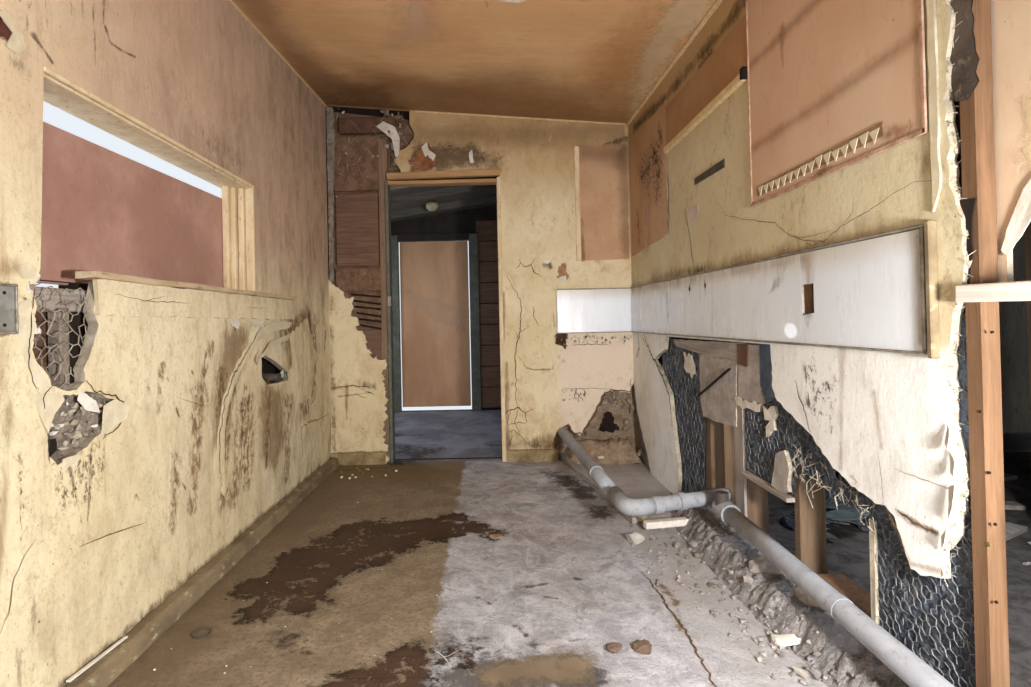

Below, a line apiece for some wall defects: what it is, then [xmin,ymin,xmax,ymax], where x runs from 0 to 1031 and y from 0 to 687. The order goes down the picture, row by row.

flaking render [326,107,478,360]
flaking render [544,0,967,280]
crack [725,180,932,246]
spalling [13,264,129,469]
damp [171,341,214,530]
damp [219,369,254,509]
crack [505,260,672,443]
spalling [553,383,650,468]
flaking render [683,352,696,378]
spalling [941,302,970,587]
damp [225,512,507,625]
crack [641,571,717,687]